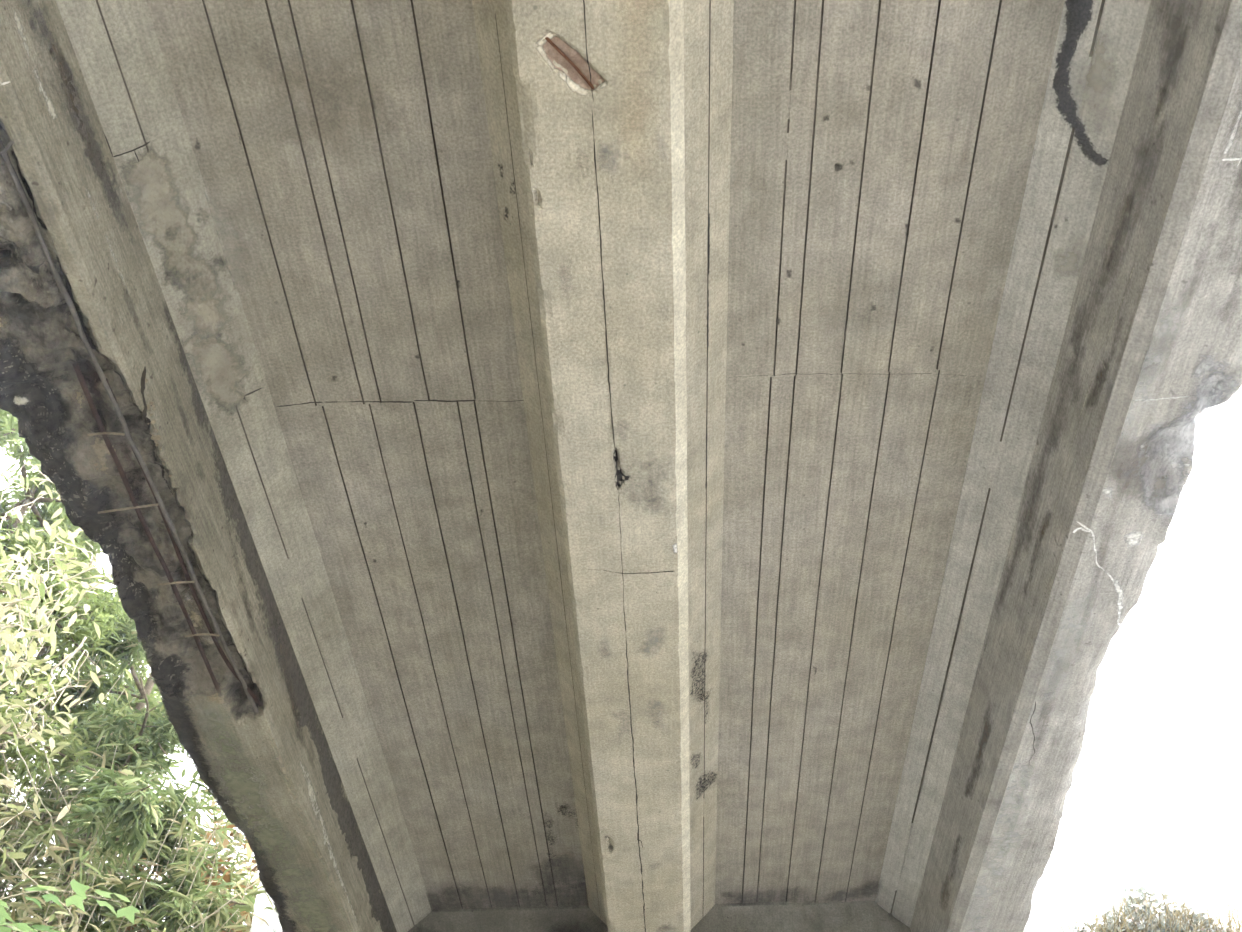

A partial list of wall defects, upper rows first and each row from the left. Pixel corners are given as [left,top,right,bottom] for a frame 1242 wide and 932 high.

spalling [0,138,264,719]
spalling [537,32,606,95]
crack [583,0,615,448]
damp [1053,0,1108,166]
crack [1053,266,1135,627]
crack [589,497,674,932]